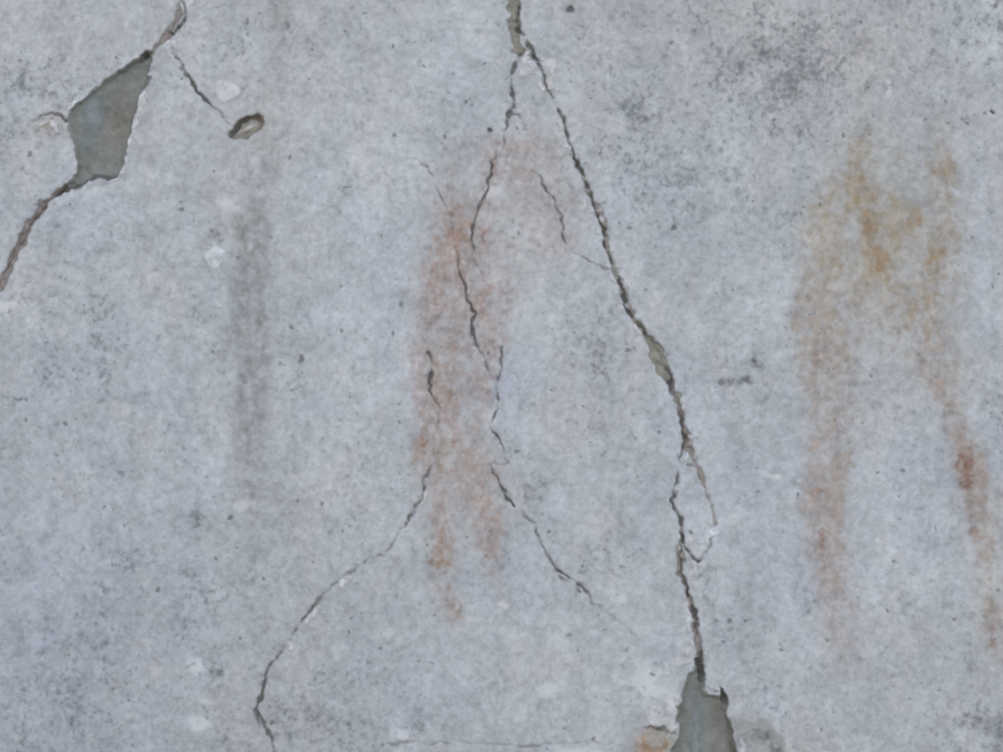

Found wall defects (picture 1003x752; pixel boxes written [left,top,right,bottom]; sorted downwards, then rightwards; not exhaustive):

crack [140,0,210,104]
spalling [38,51,154,195]
crack [0,187,67,291]
crack [471,162,493,241]
crack [425,352,433,395]
crack [459,272,477,342]
crack [504,0,720,677]
crack [391,475,427,567]
crack [492,472,538,536]
crack [254,572,375,741]
spalling [646,658,746,752]